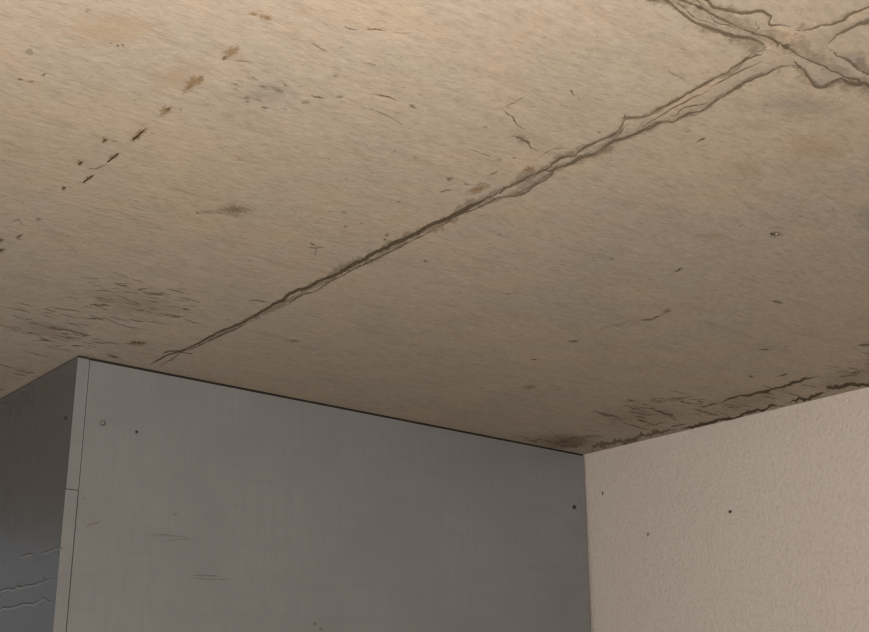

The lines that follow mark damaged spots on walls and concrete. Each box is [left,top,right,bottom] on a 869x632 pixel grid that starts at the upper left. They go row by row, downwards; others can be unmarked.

crack [152,0,869,366]
crack [700,374,814,408]